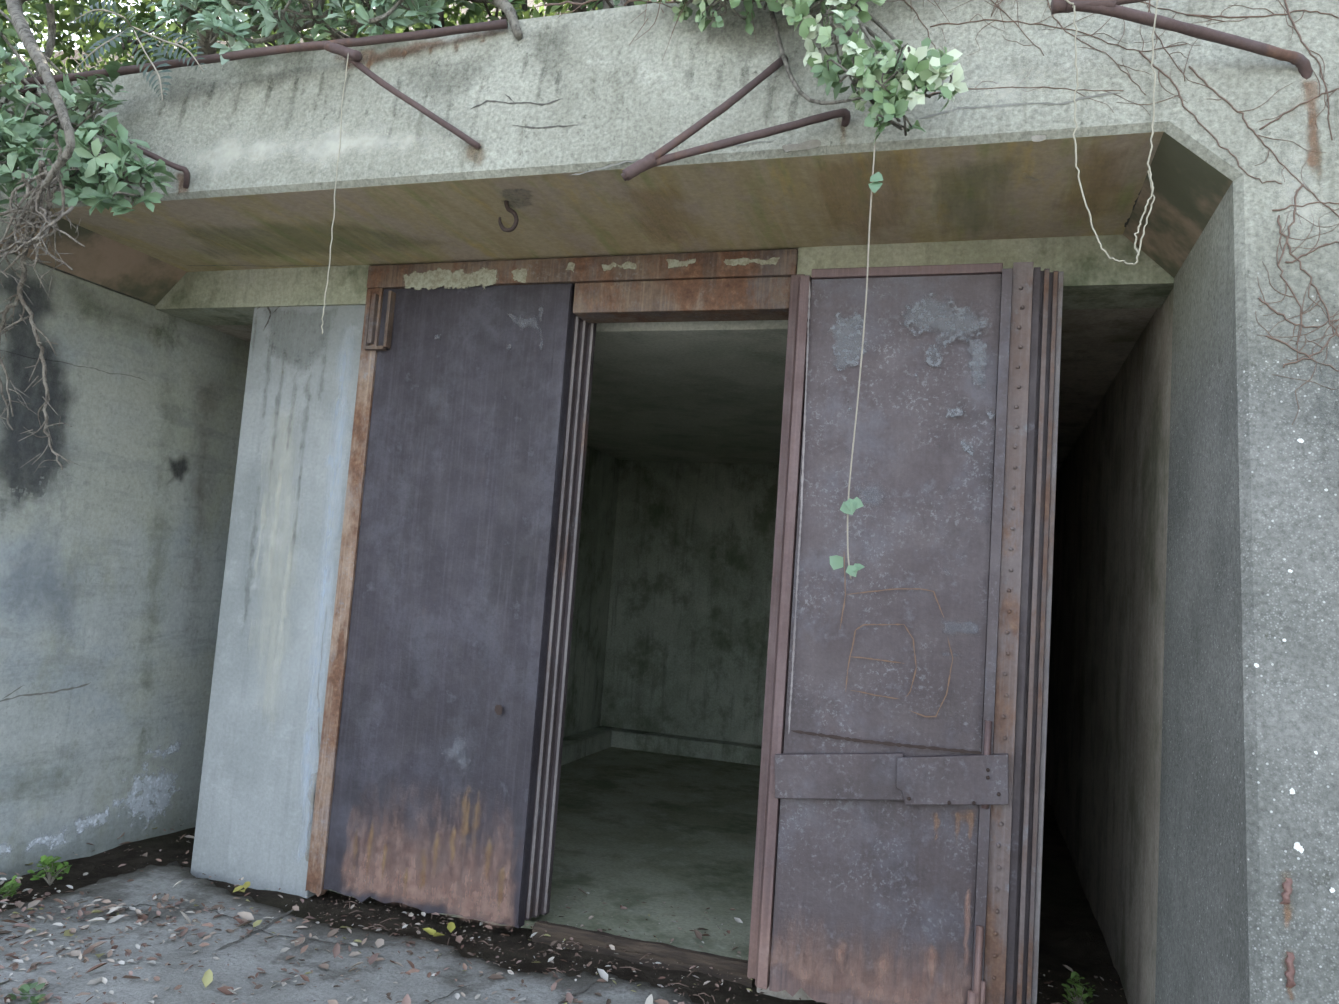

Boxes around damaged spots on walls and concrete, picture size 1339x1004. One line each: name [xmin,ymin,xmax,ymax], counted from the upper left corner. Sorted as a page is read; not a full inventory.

rust [346,31,493,69]
crack [471,94,573,129]
rust [1305,83,1319,166]
peeling [403,267,527,290]
peeling [666,259,696,268]
peeling [719,257,780,266]
peeling [902,293,991,388]
damp [0,274,67,499]
damp [171,459,187,479]
crack [0,683,90,702]
damp [0,741,181,854]
rust [344,836,512,923]